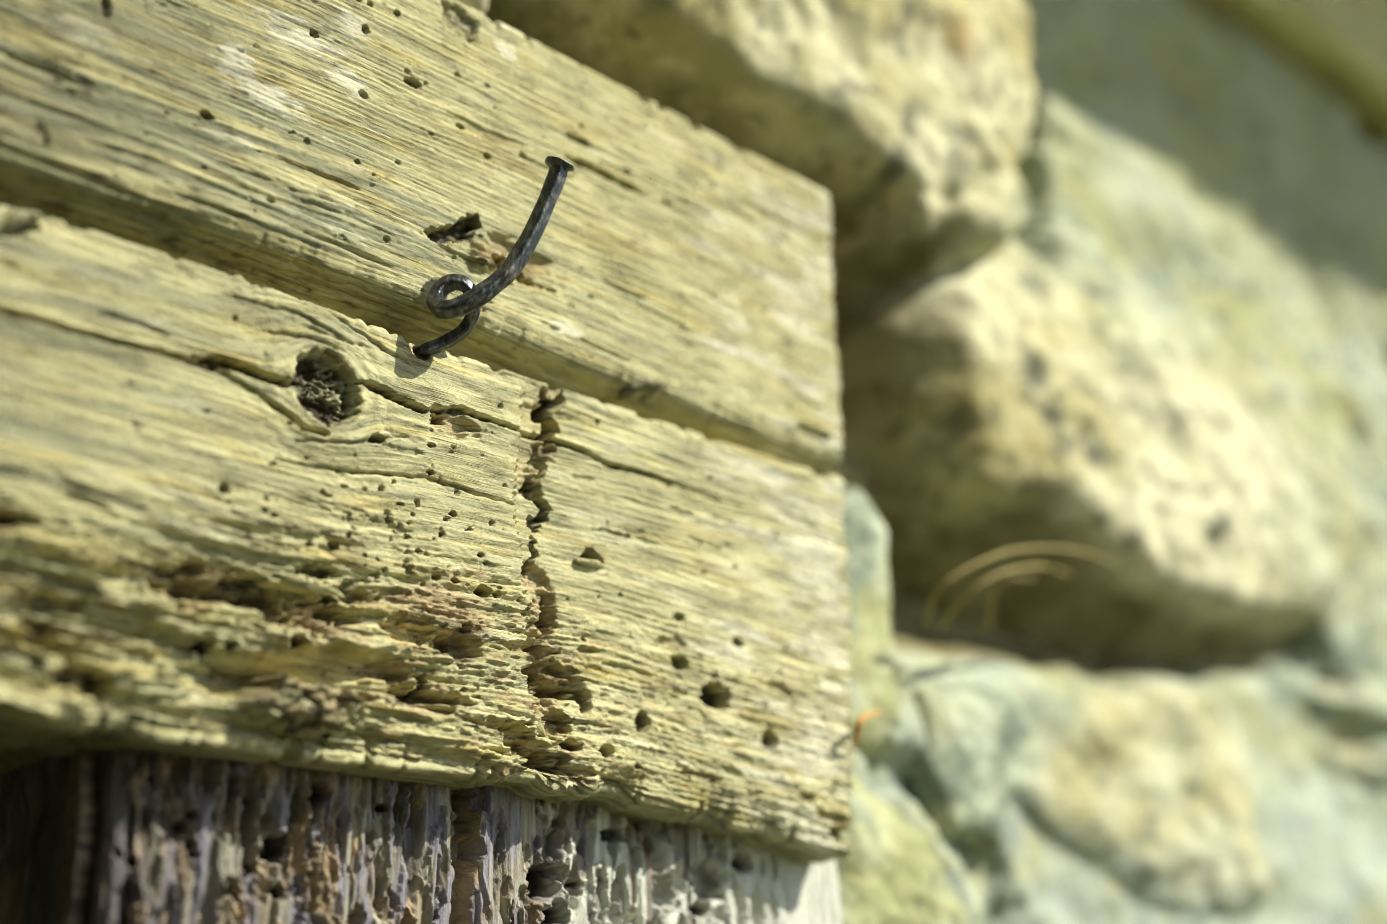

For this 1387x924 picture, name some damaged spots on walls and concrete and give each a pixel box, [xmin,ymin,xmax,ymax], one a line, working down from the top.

crack [349,379,722,503]
crack [399,673,433,703]